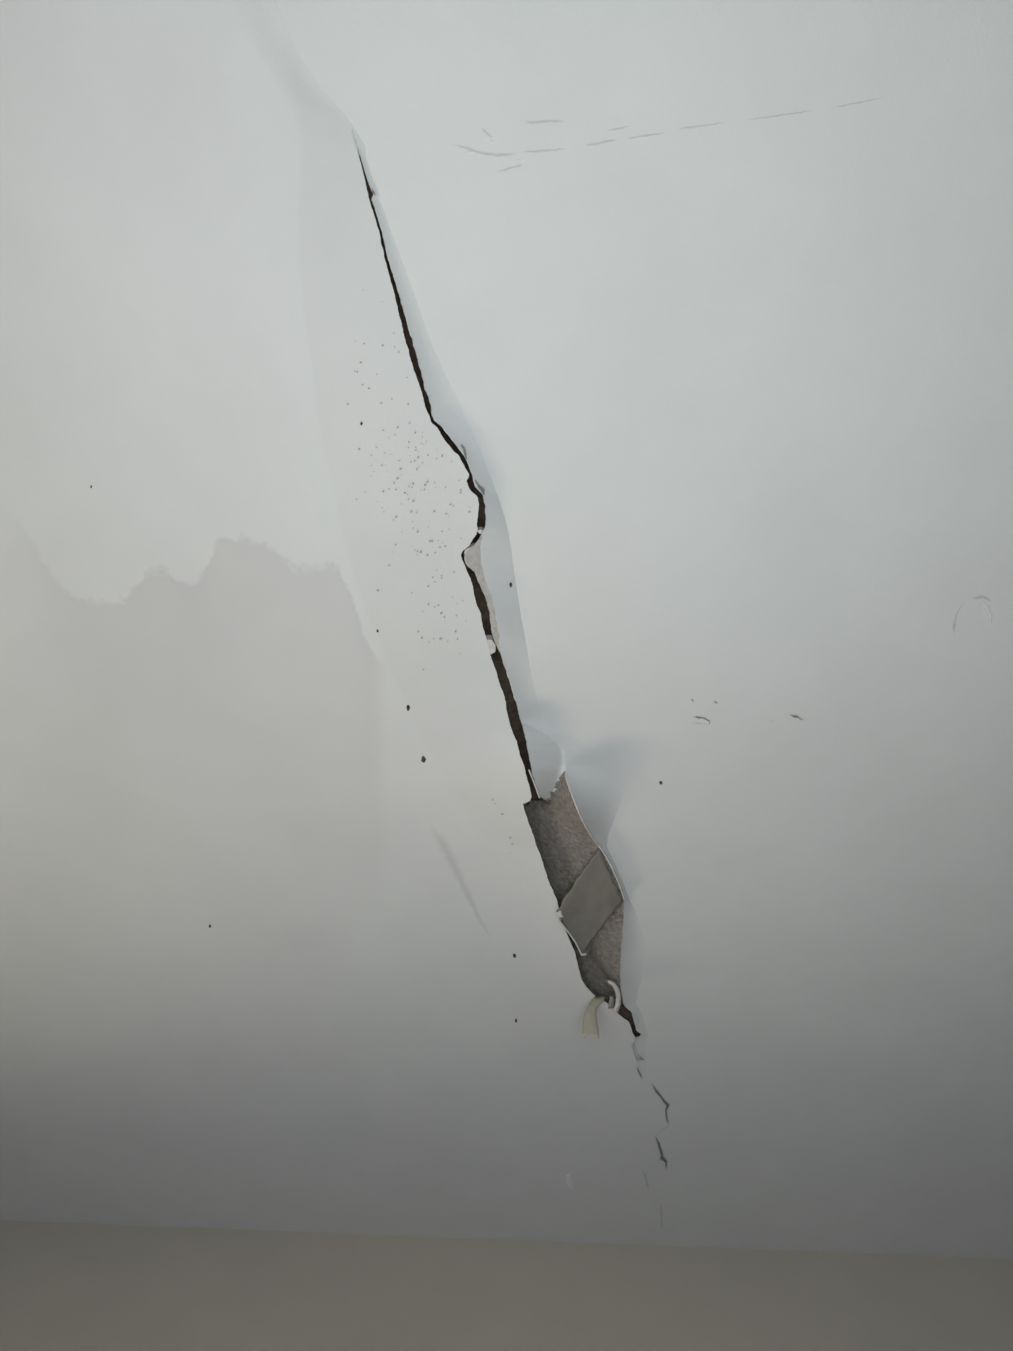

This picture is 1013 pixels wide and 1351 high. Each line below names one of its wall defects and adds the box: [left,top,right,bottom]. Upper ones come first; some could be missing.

crack [359,155,550,806]
flaking render [523,769,626,1038]
crack [618,1004,669,1166]